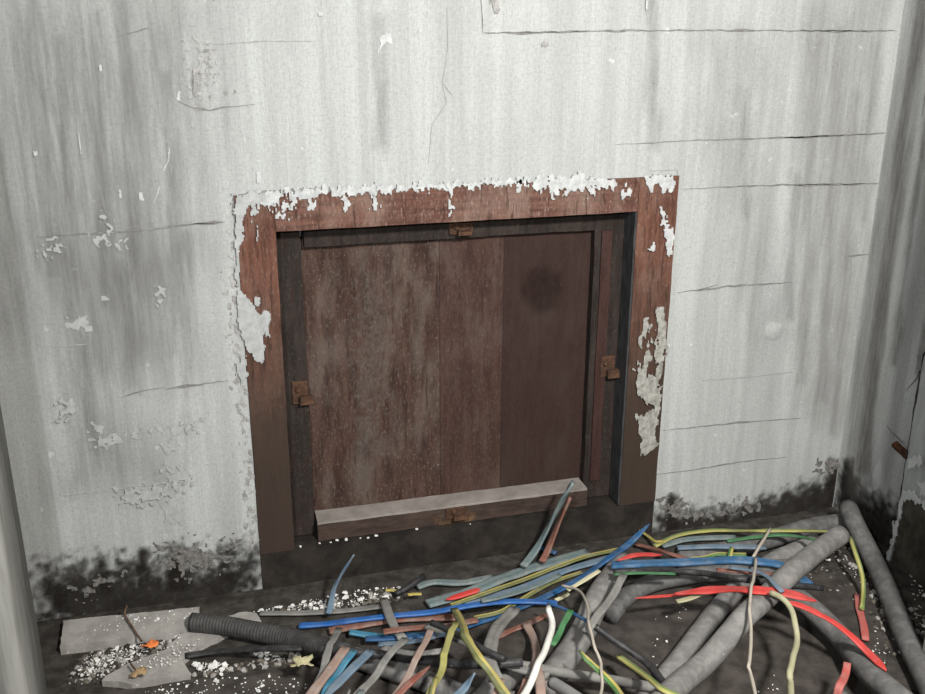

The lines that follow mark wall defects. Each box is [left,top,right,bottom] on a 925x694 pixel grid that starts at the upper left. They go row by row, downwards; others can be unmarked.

peeling [644,173,676,194]
peeling [36,236,66,261]
peeling [647,206,675,257]
peeling [59,315,93,332]
crack [123,380,228,397]
peeling [86,171,632,584]
peeling [632,307,669,456]
peeling [907,454,923,469]
damp [652,459,925,589]
peeling [886,480,925,561]
spalling [67,569,128,604]
damp [36,546,262,621]